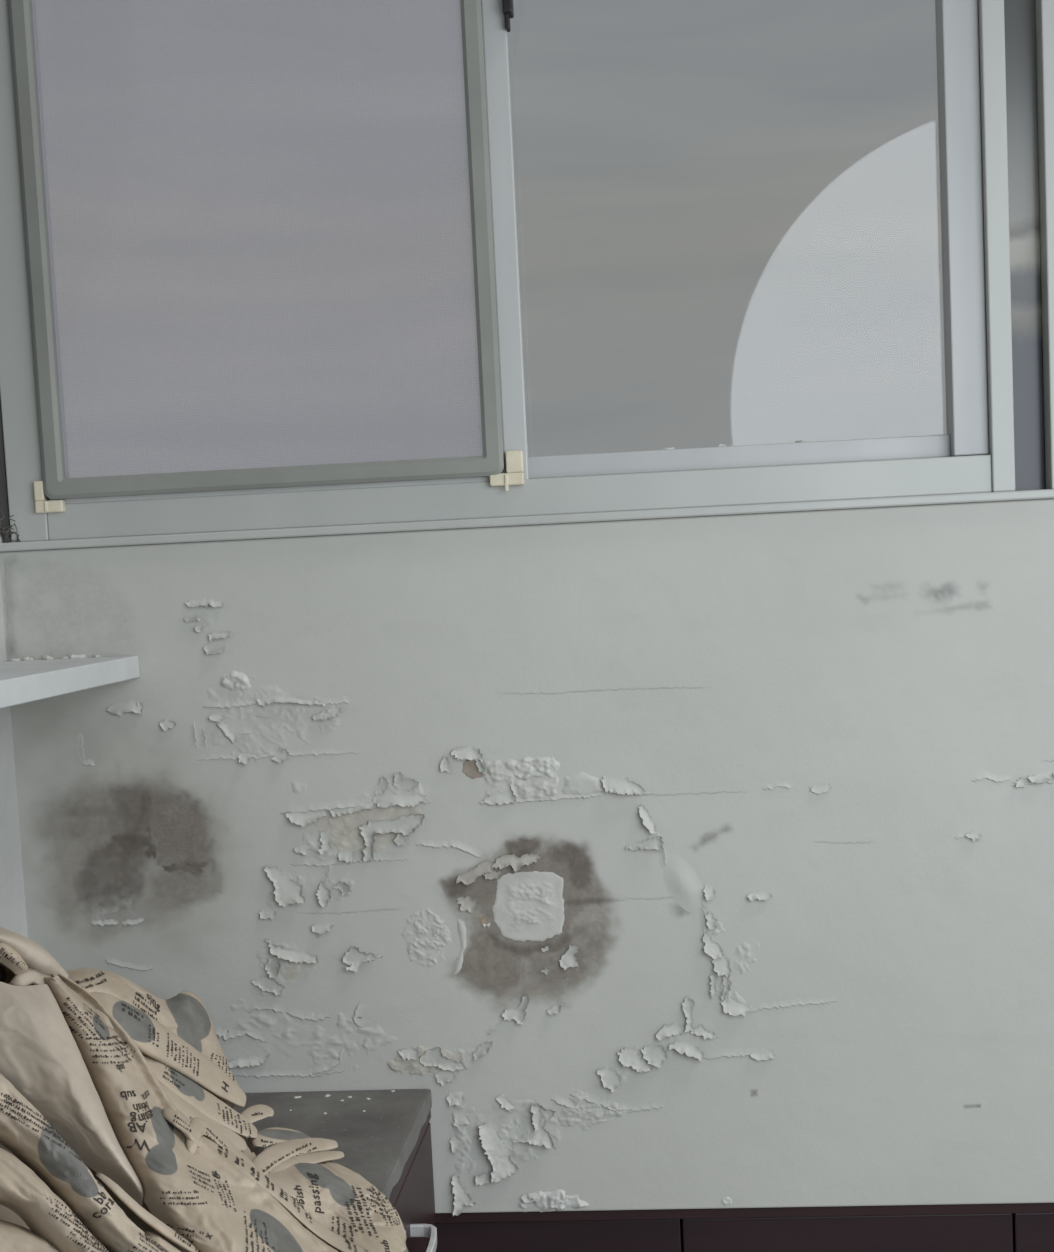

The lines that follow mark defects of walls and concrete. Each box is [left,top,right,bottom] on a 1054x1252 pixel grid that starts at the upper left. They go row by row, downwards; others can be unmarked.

peeling [160,670,358,765]
peeling [252,939,321,999]
peeling [259,772,432,939]
peeling [343,946,382,972]
water stain [415,838,606,997]
flaking render [440,746,747,868]
peeling [699,882,837,1016]
peeling [387,994,776,1216]